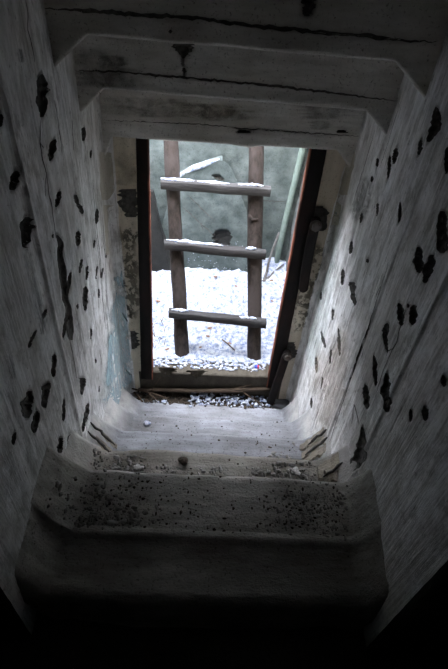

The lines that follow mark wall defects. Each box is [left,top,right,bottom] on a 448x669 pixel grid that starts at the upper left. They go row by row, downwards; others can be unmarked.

crack [45,7,436,43]
spalling [36,74,50,117]
crack [79,70,393,101]
spalling [412,211,448,283]
spalling [52,234,104,340]
spalling [20,354,57,433]
spalling [362,355,392,412]
spalling [299,427,340,482]
spalling [350,427,367,471]